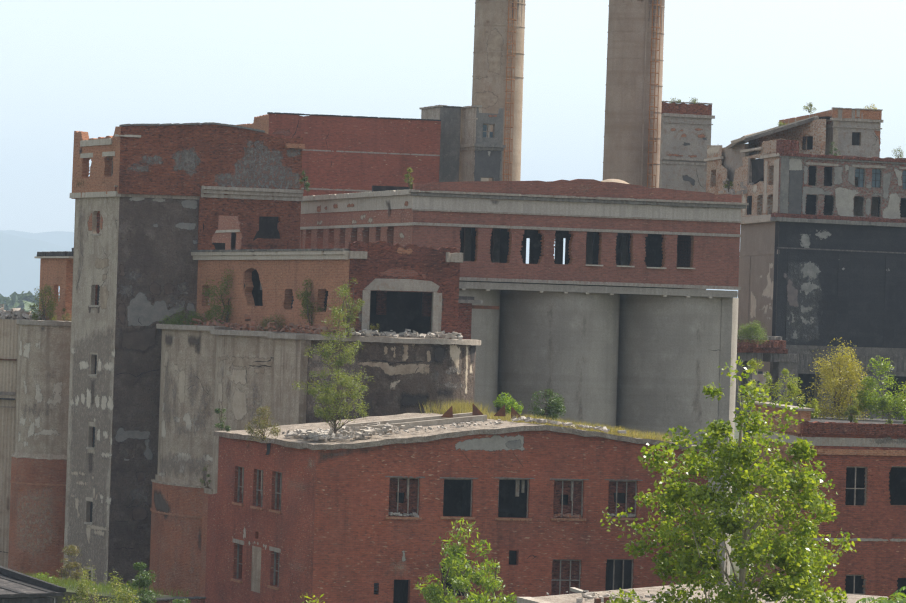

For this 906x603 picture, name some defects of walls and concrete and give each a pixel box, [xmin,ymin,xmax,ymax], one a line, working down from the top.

peeling [215,141,300,190]
peeling [788,158,902,219]
peeling [799,229,831,248]
peeling [750,261,821,339]
peeling [71,347,115,371]
damp [449,344,476,394]
peeling [18,380,114,458]